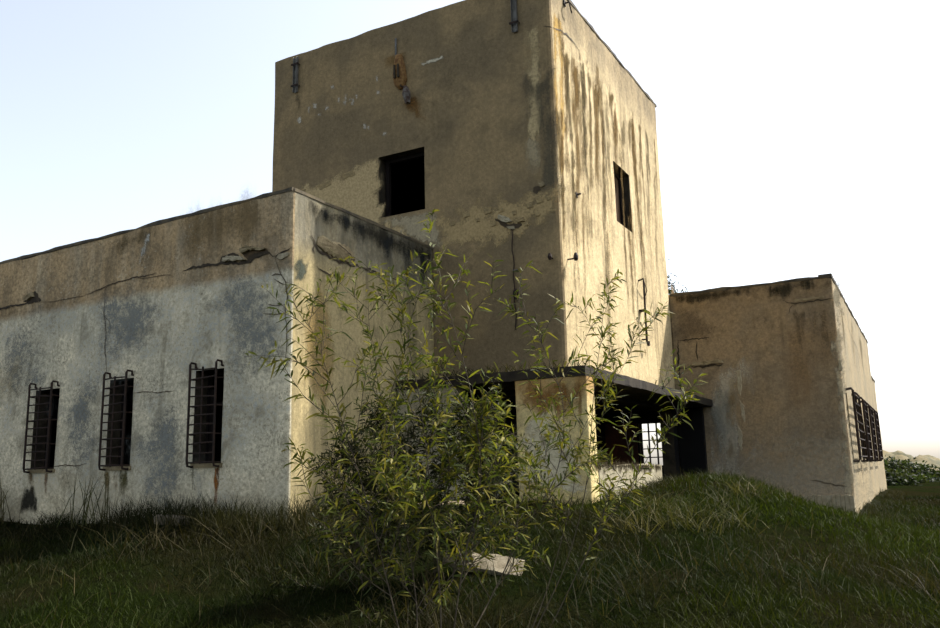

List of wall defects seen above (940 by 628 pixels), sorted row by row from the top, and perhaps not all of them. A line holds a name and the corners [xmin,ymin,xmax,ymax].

flaking render [301,159,565,252]
leakage [526,16,658,309]
crack [0,274,163,372]
crack [263,259,288,359]
corrosion [524,383,582,415]
crack [677,337,723,389]
leakage [676,288,749,303]
leakage [769,280,813,297]